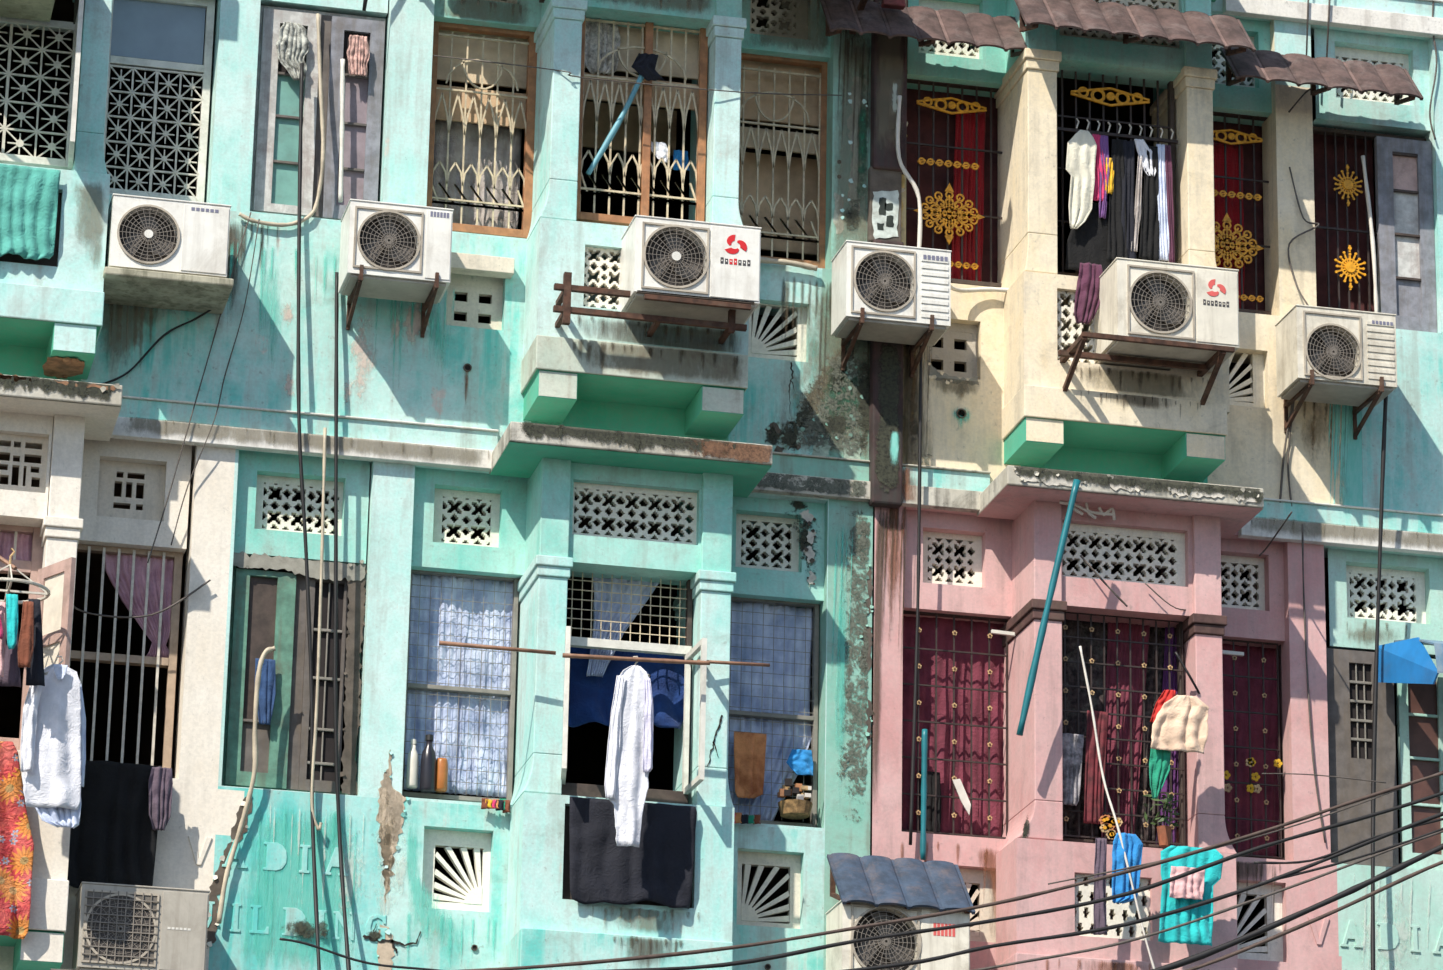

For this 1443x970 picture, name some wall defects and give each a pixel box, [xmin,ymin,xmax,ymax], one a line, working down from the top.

peeling [233,551,367,795]
leakage [521,281,931,822]
peeling [799,509,817,586]
peeling [376,751,410,970]